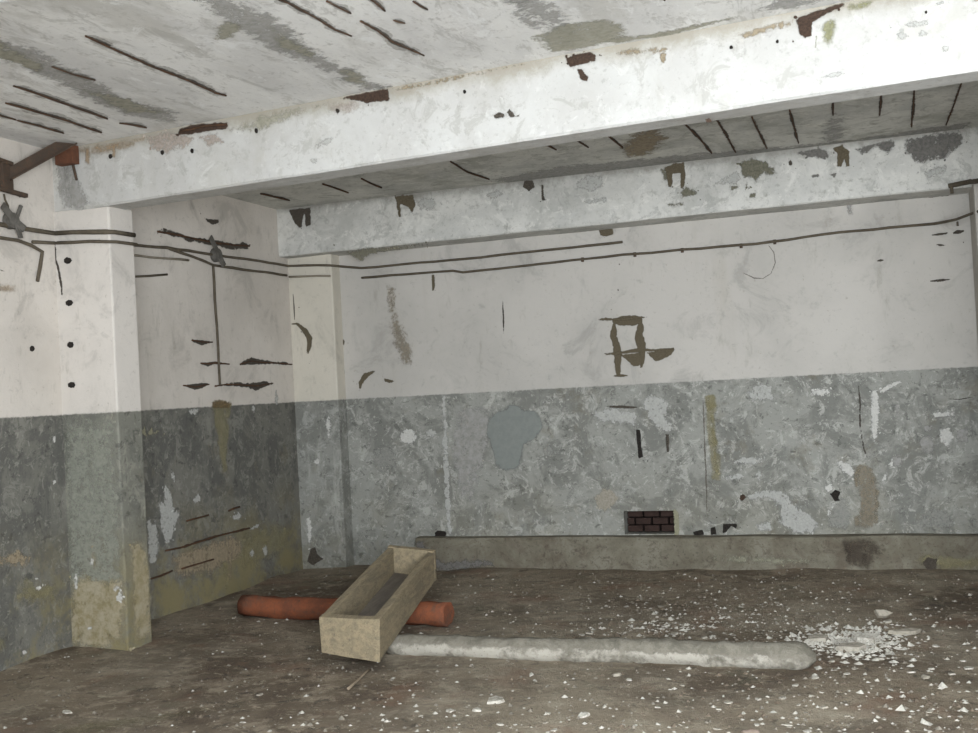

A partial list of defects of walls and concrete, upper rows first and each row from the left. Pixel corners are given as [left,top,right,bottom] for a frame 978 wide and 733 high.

spalling [326,0,425,56]
spalling [792,3,844,42]
spalling [0,85,108,134]
damp [0,40,179,121]
spalling [85,35,227,97]
spalling [343,89,401,106]
spalling [561,51,602,81]
peeling [706,118,775,198]
peeling [789,83,967,184]
spalling [600,309,675,377]
flaking render [69,471,259,648]
corrosion [171,535,241,578]